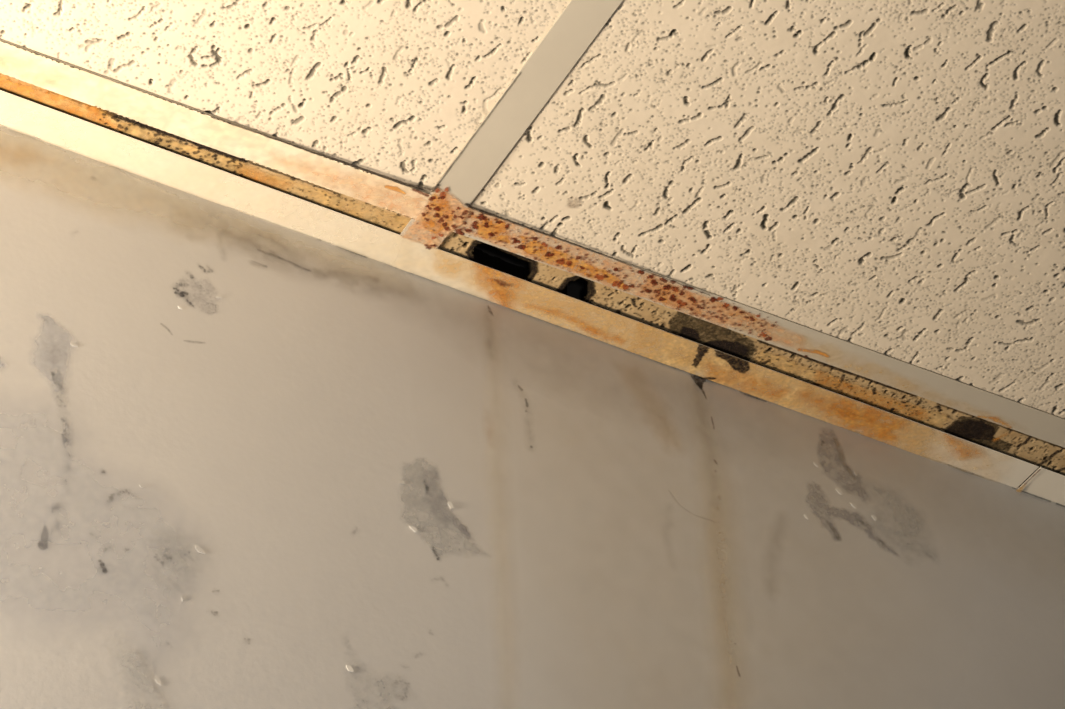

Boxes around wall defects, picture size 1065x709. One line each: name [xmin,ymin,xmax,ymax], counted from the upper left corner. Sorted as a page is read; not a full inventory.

corrosion [404,187,829,357]
corrosion [478,265,930,455]